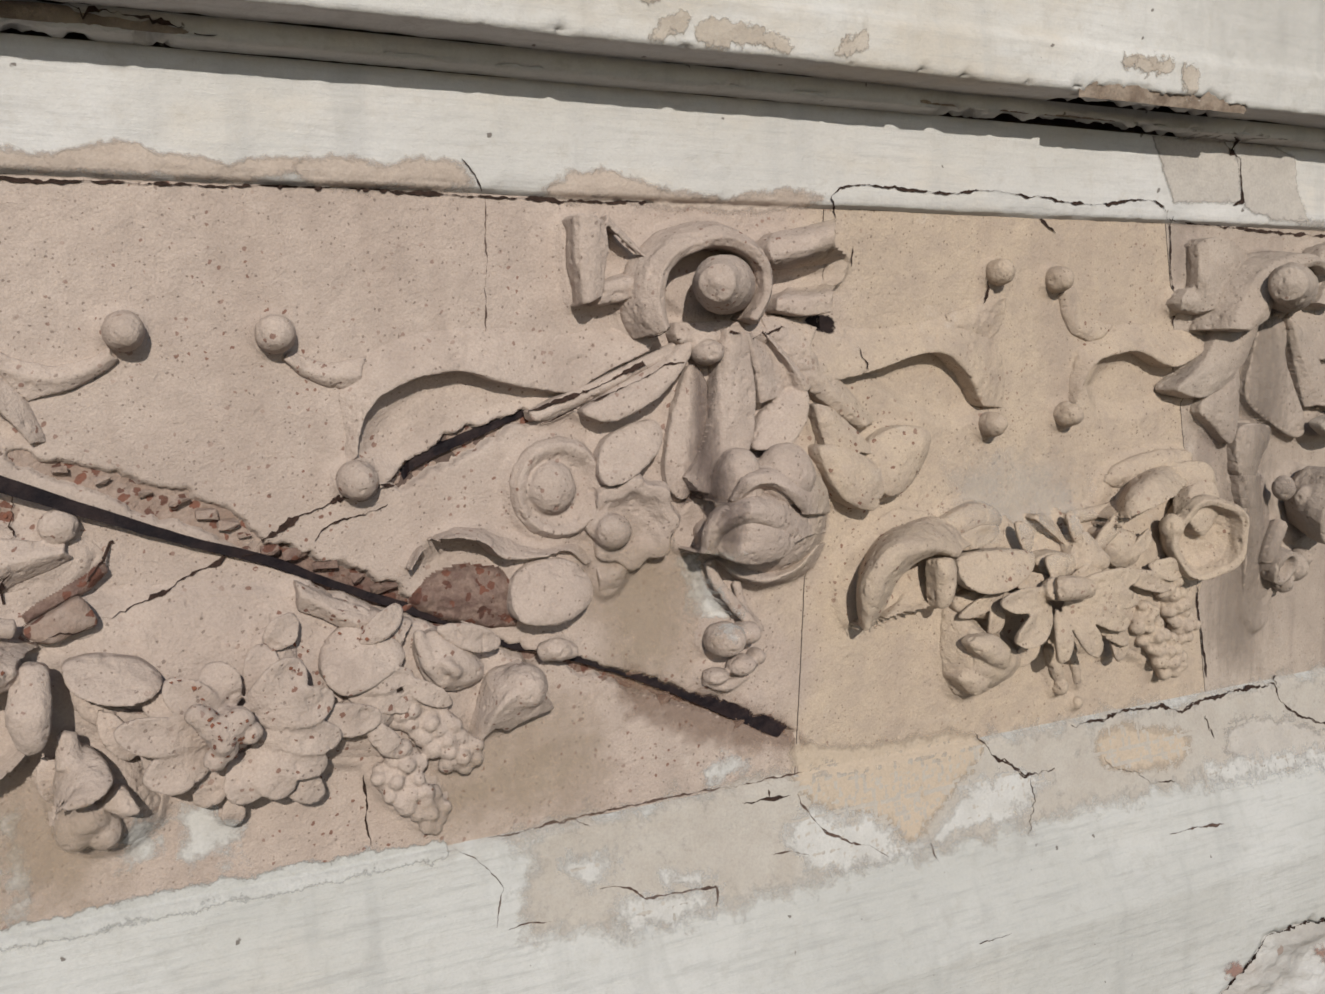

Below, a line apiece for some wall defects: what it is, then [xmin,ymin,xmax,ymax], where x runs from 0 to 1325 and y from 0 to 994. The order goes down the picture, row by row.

peeling [648,9,795,54]
peeling [835,29,869,58]
spalling [1079,52,1246,114]
peeling [0,138,471,194]
crack [831,137,1325,325]
crack [528,329,685,425]
crack [730,326,782,339]
crack [0,483,395,643]
crack [1071,581,1325,737]
crack [977,735,1055,836]
crack [444,772,887,930]
spalling [1220,920,1325,994]